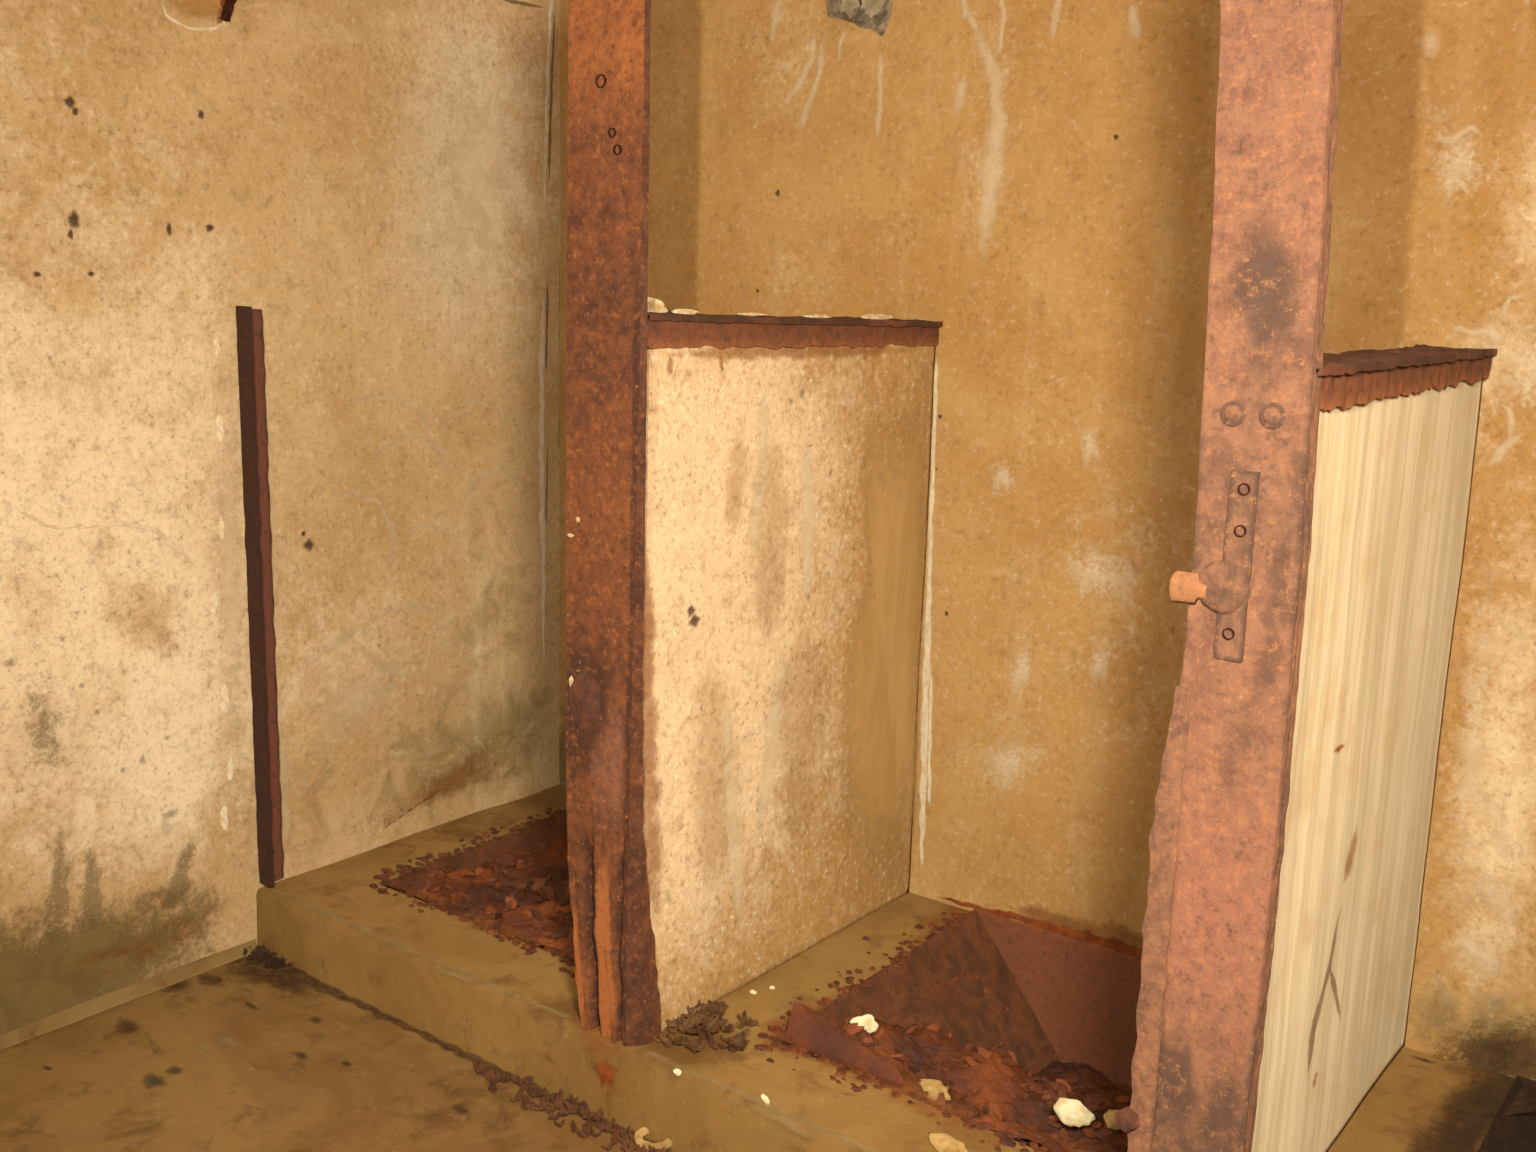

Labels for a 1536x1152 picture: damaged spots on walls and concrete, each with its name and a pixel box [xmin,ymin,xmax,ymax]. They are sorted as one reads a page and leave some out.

crack [505,0,555,176]
leakage [961,0,1006,240]
crack [543,285,551,367]
crack [543,451,551,523]
leakage [0,890,313,1035]
leakage [146,1068,180,1087]
leakage [1414,1026,1536,1079]